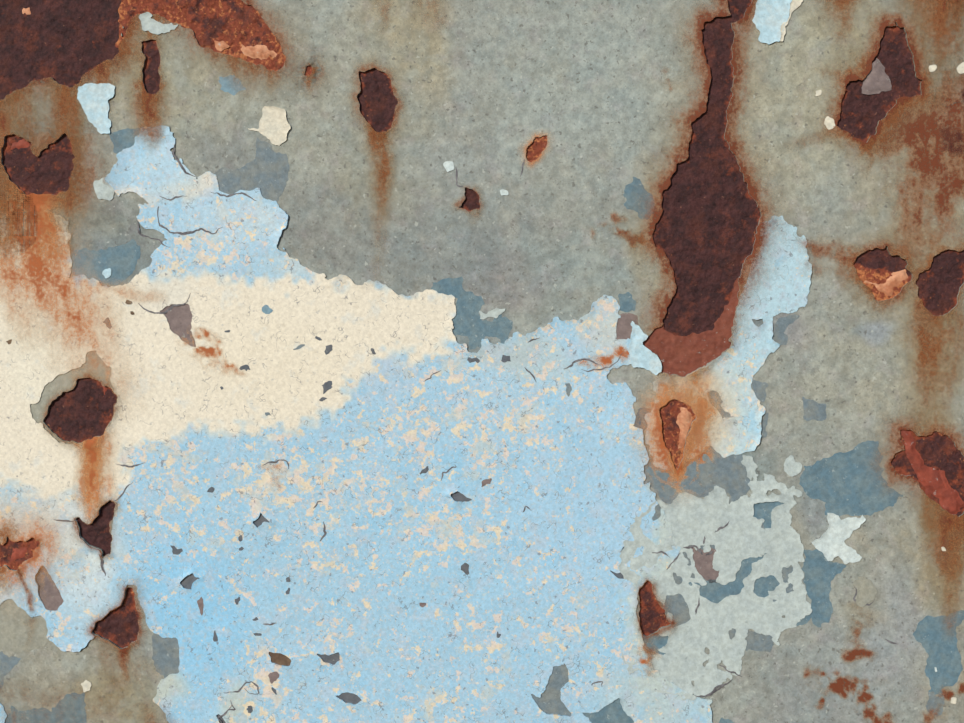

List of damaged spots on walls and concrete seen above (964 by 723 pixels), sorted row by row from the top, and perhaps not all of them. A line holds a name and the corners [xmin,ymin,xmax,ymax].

corrosion [0,0,288,348]
peeling [218,75,246,95]
corrosion [354,66,402,201]
corrosion [611,0,771,484]
corrosion [807,0,964,380]
corrosion [0,524,53,608]
corrosion [44,374,118,556]
corrosion [89,587,142,669]
peeling [0,83,712,723]
corrosion [638,581,675,664]
peeling [618,215,903,701]
corrosion [885,422,964,600]